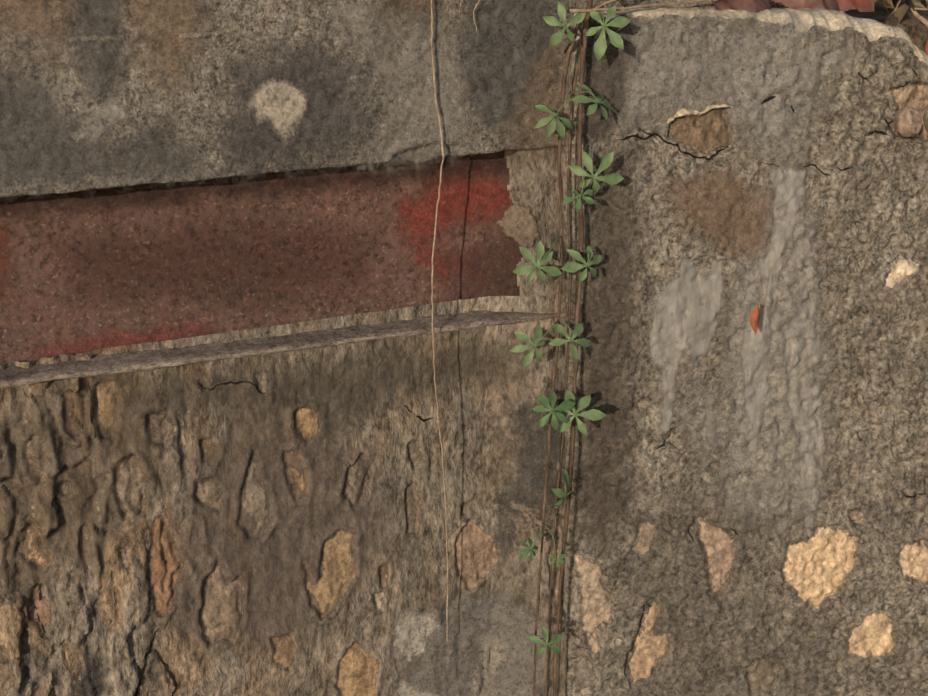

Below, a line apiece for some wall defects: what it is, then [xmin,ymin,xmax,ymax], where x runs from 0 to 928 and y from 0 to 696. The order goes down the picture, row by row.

damp [221,46,369,174]
damp [381,17,461,159]
damp [464,0,553,128]
crack [615,128,729,161]
corrosion [0,158,507,214]
crack [198,377,265,399]
damp [740,304,771,459]
flaking render [695,516,736,597]
flaking render [782,527,857,608]
flaking render [898,540,928,583]
crack [135,521,177,696]
flaking render [628,603,672,683]